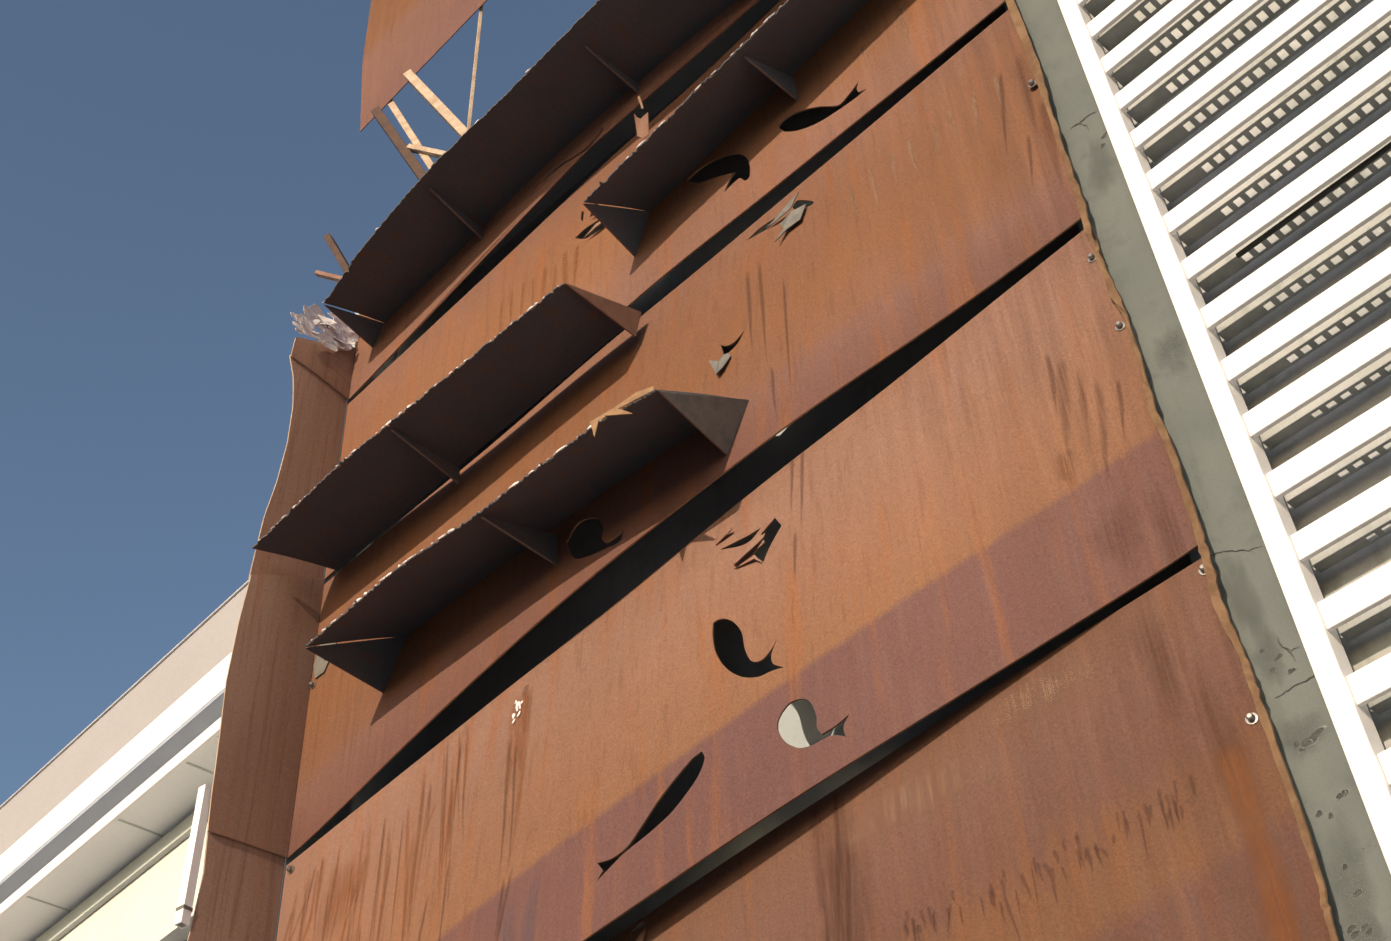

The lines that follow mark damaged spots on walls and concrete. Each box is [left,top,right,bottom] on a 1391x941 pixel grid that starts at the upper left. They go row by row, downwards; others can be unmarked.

peeling [290,301,359,351]